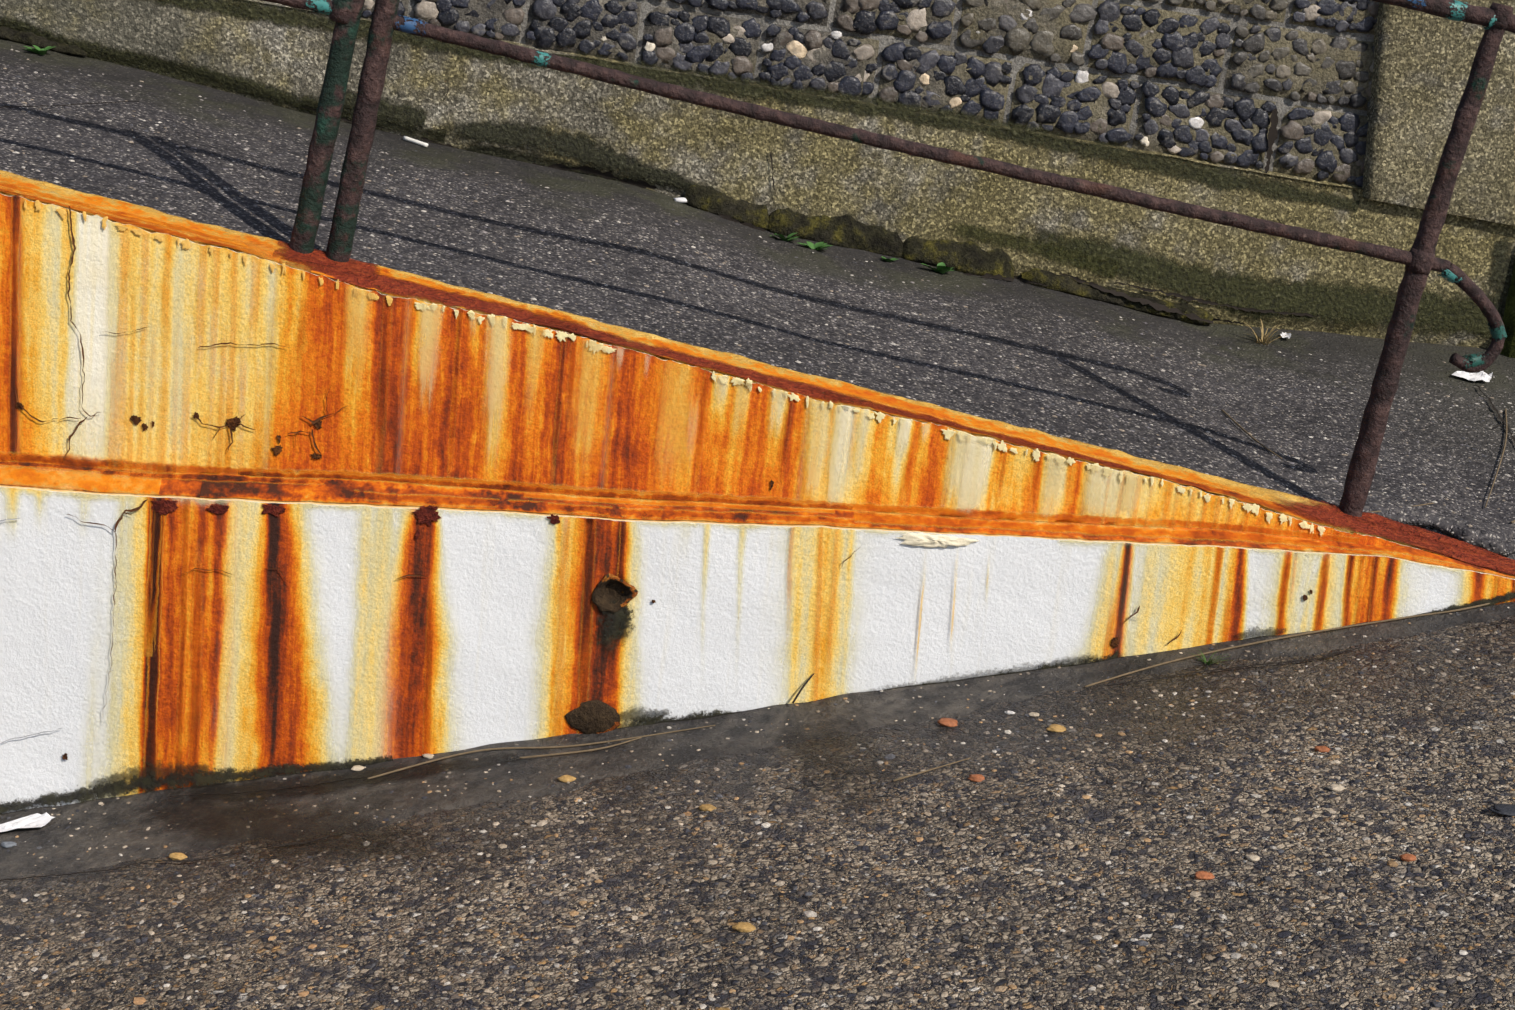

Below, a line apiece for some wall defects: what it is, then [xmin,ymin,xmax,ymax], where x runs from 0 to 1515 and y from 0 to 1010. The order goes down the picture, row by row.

crack [16,207,147,461]
crack [198,341,286,349]
corrosion [0,174,1515,797]
peeling [941,429,1326,536]
crack [0,728,62,744]
spalling [565,700,621,734]